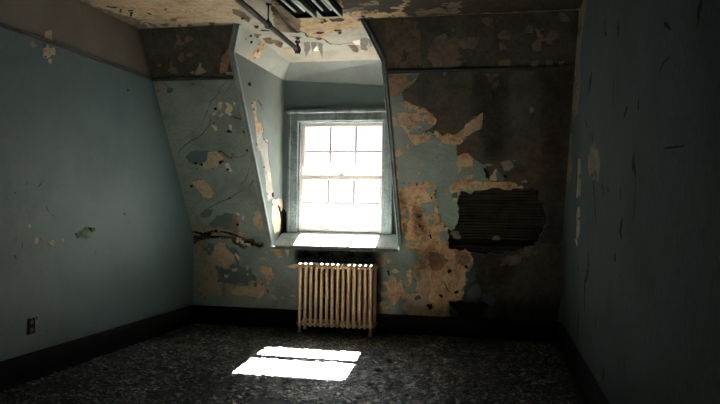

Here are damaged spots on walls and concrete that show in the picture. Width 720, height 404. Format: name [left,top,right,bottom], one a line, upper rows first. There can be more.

peeling [29,30,56,64]
peeling [80,0,604,322]